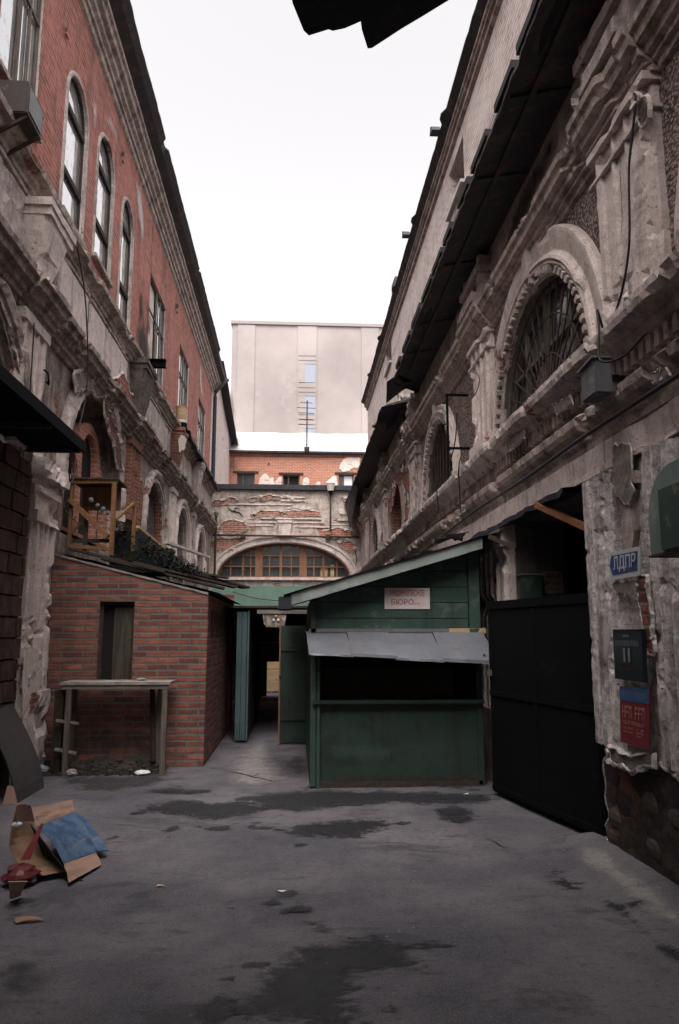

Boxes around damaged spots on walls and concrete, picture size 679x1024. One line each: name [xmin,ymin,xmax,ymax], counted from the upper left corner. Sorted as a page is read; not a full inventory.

spalling [210,463,321,553]
spalling [318,527,357,553]
spalling [635,573,658,659]
flaking render [22,647,46,724]
damp [63,772,501,847]
damp [196,935,452,1024]